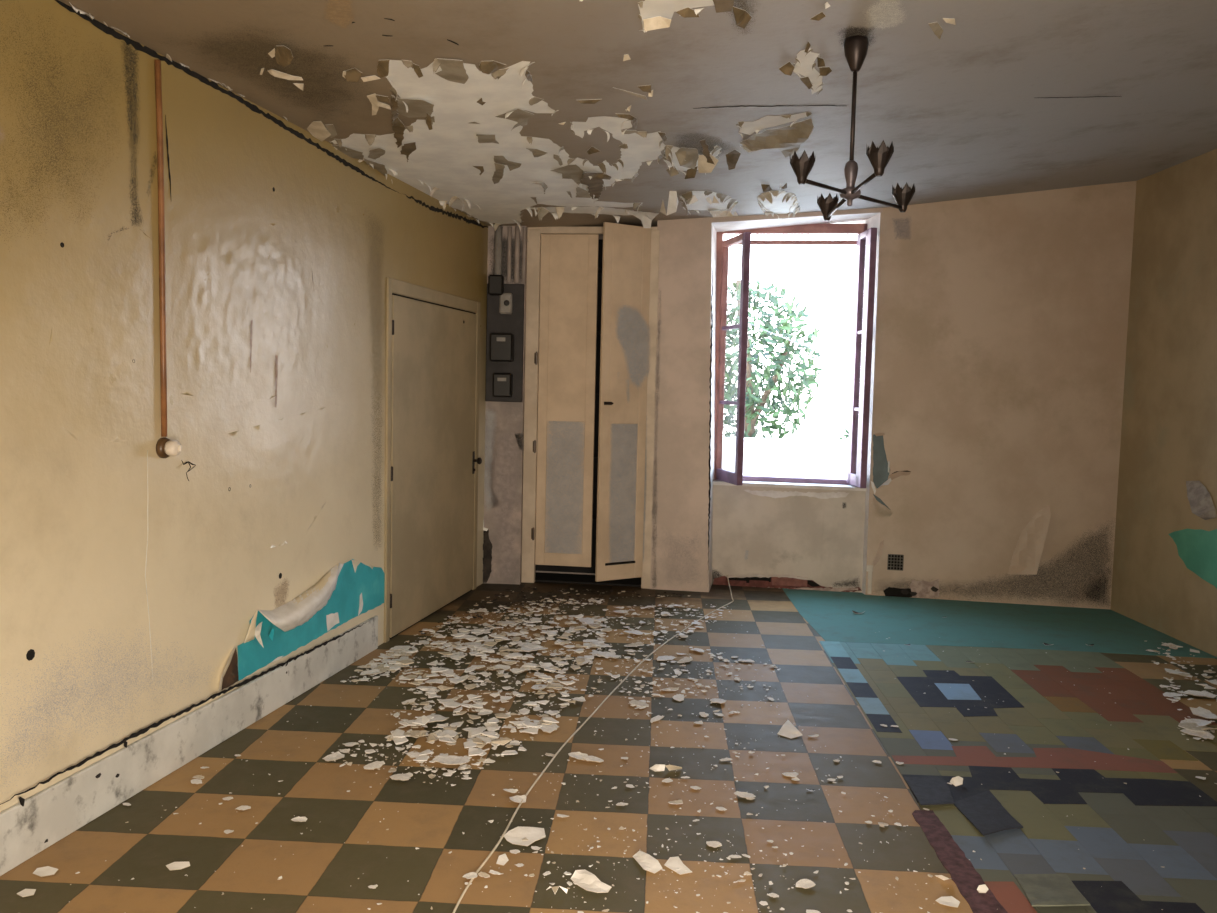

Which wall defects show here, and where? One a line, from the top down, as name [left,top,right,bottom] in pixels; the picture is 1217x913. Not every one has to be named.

peeling [638,0,752,33]
peeling [810,2,830,21]
peeling [260,46,304,90]
peeling [779,41,832,95]
peeling [307,58,814,231]
peeling [219,559,385,691]
crack [0,620,370,806]